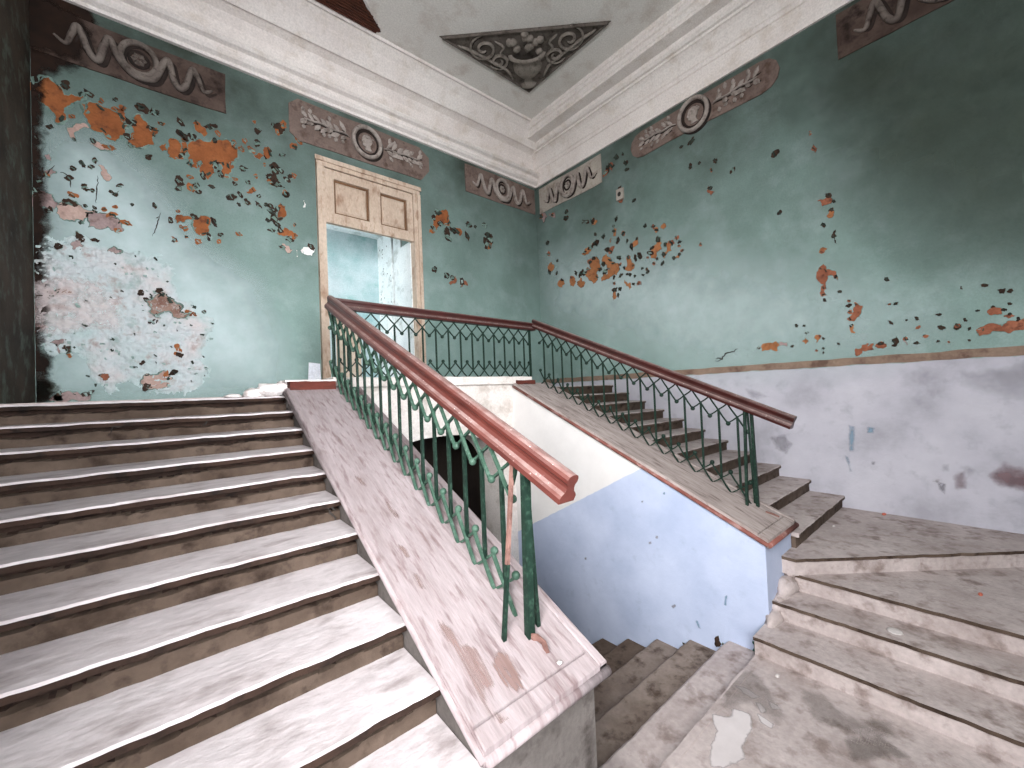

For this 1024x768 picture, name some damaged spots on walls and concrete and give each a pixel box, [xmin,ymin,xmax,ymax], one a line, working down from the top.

peeling [30,74,315,257]
peeling [603,152,629,177]
peeling [429,209,493,250]
peeling [432,266,468,288]
peeling [546,215,684,300]
peeling [816,193,863,333]
spalling [50,339,72,358]
spalling [48,373,110,402]
spalling [139,344,184,392]
spalling [137,288,206,324]
peeling [757,324,825,354]
peeling [854,283,1024,356]